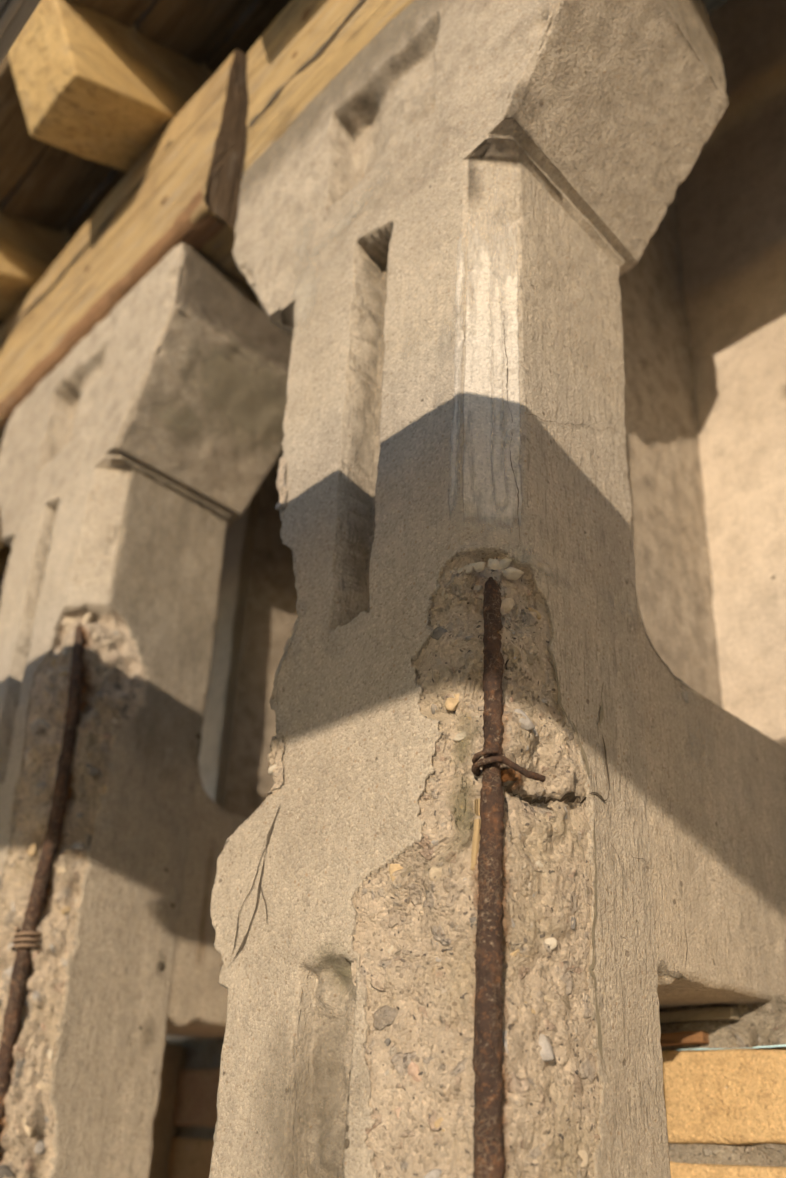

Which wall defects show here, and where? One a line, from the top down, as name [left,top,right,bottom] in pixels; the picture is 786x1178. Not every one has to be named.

crack [492,315,624,538]
spalling [0,608,148,1178]
crack [228,805,280,966]
spalling [224,451,298,819]
spalling [351,552,608,1178]
crack [501,682,610,805]